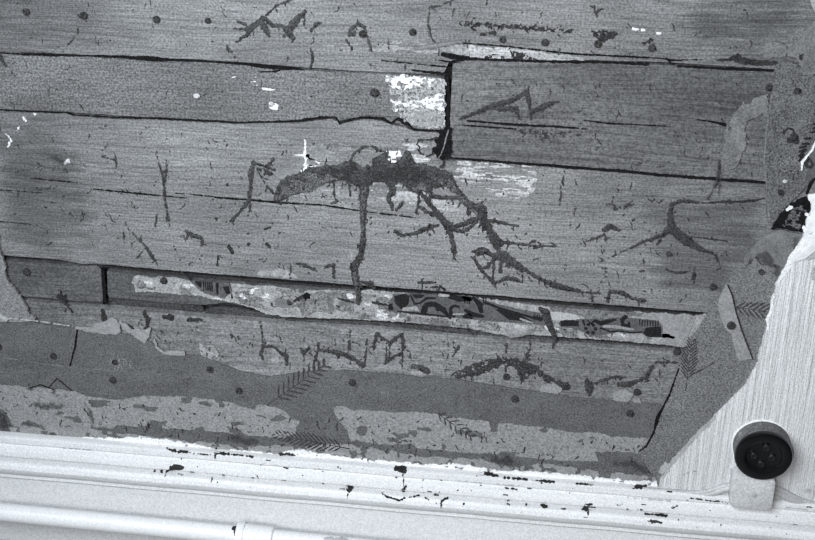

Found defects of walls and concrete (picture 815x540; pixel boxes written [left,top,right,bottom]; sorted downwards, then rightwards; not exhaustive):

peeling [372,39,585,61]
peeling [381,74,447,129]
peeling [294,139,354,172]
peeling [386,142,436,163]
peeling [454,161,538,199]
peeling [371,183,461,212]
damp [258,268,296,278]
crack [69,329,78,366]
peeling [331,328,504,375]
peeling [230,365,310,376]
peeling [83,436,215,449]
peeling [230,449,657,486]